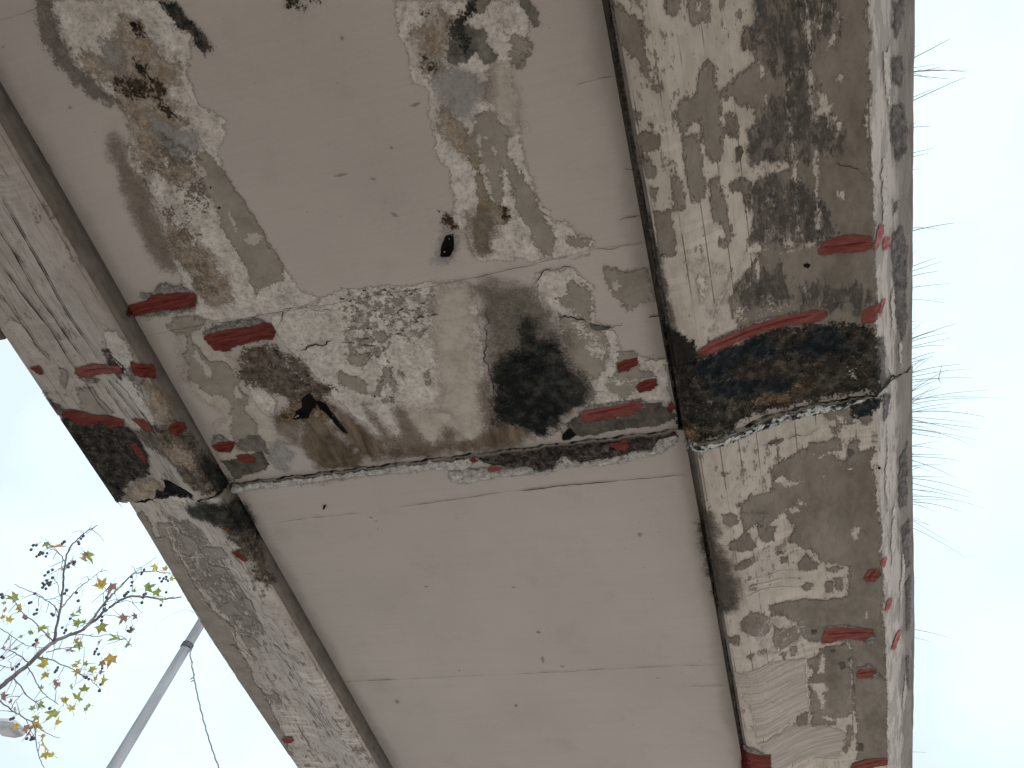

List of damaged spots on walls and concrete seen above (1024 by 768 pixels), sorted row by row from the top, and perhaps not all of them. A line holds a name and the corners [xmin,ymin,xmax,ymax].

peeling [127,283,276,479]
damp [35,0,891,589]
peeling [435,109,593,262]
peeling [469,279,678,472]
peeling [633,0,903,368]
damp [890,55,905,88]
damp [891,0,906,40]
damp [889,103,909,160]
damp [890,201,909,341]
peeling [136,508,310,756]
peeling [721,409,905,768]
damp [898,441,912,634]